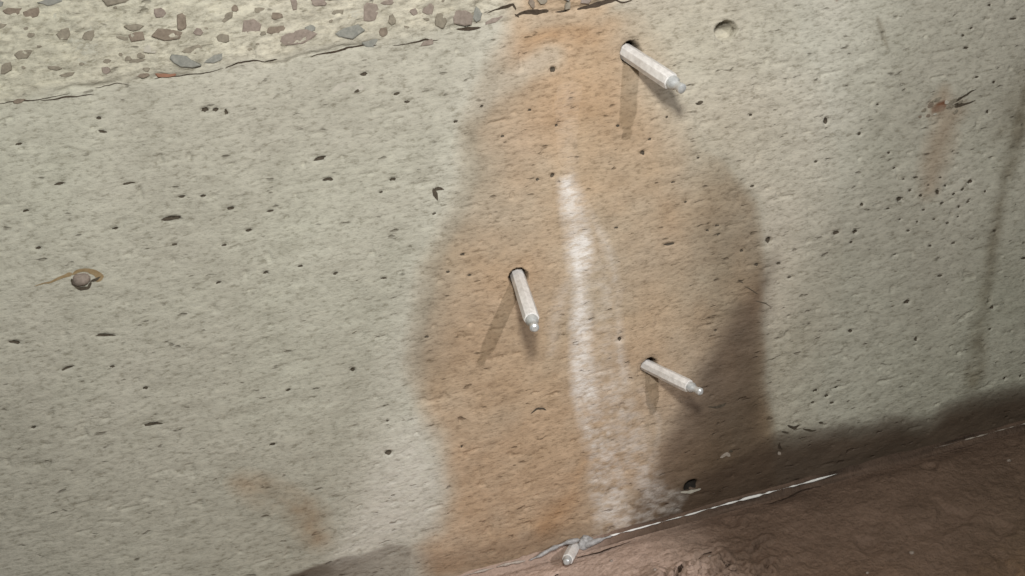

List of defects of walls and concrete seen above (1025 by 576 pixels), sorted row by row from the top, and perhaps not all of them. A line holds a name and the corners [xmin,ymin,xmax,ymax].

crack [311,0,632,57]
crack [155,59,277,79]
crack [0,83,127,104]
corrosion [914,80,976,206]
damp [284,0,1025,576]
crack [578,541,631,558]
crack [673,552,731,573]